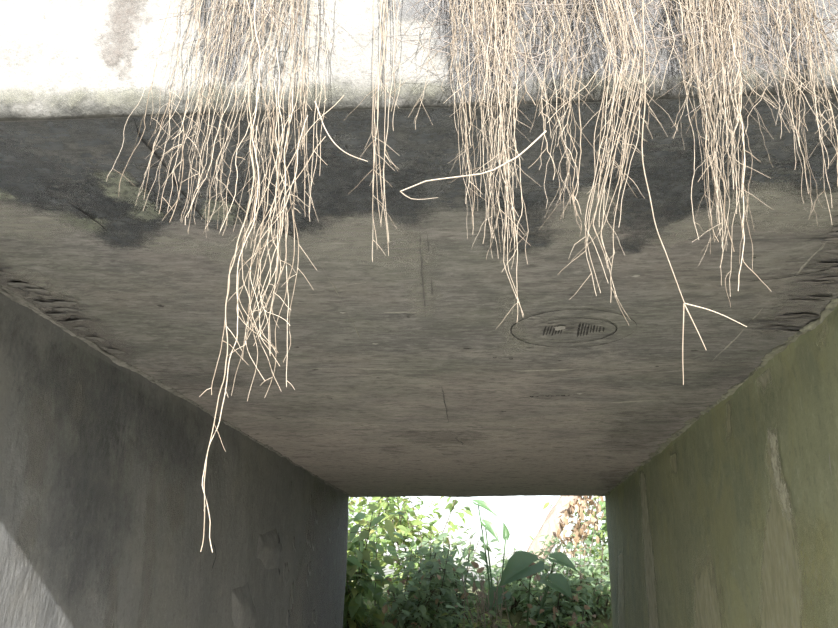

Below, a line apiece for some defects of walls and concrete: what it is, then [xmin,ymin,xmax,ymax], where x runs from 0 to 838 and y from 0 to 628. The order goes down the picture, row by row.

crack [134,120,224,232]
damp [0,95,838,272]
peeling [0,267,129,358]
peeling [740,216,838,332]